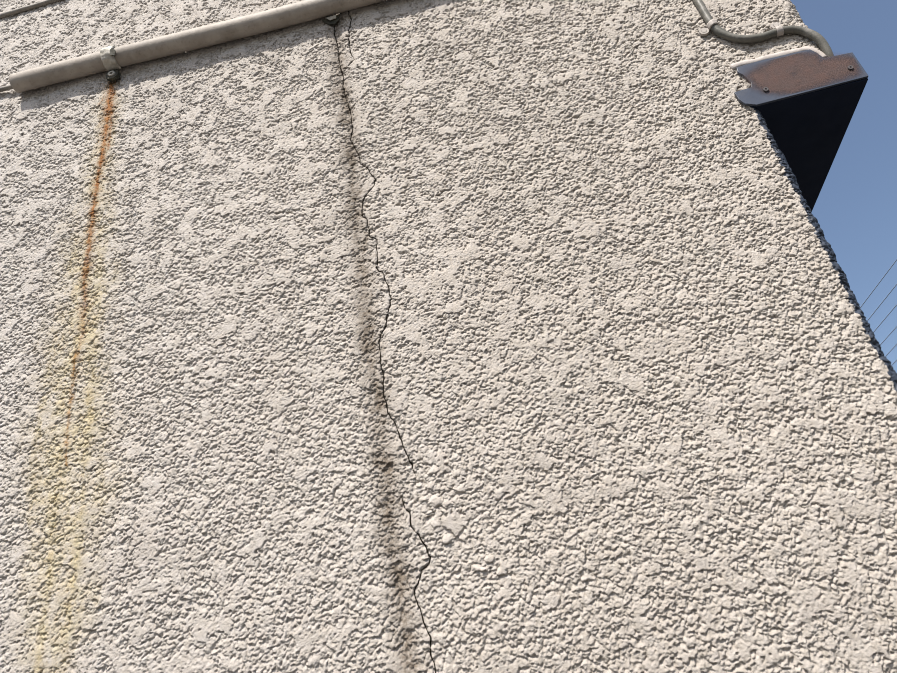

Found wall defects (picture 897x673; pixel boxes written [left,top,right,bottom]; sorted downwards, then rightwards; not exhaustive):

corrosion [90,83,114,227]
crack [334,11,416,476]
crack [402,500,436,673]